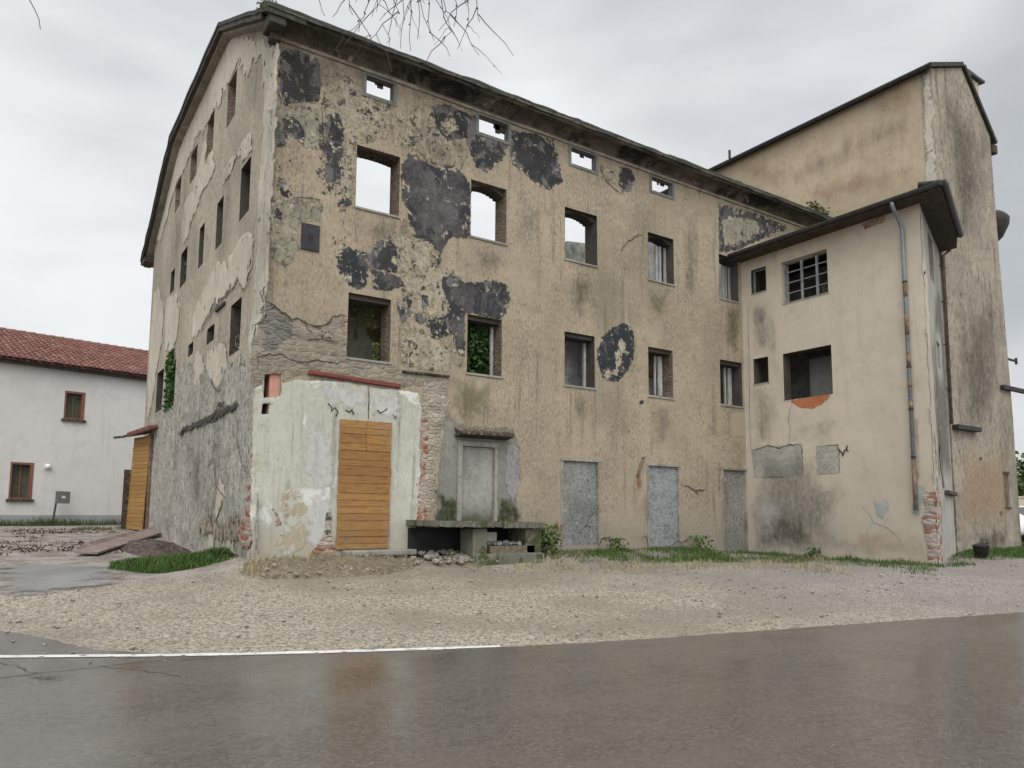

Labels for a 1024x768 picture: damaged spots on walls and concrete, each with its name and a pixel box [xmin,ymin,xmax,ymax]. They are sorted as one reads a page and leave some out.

flaking render [147,34,563,561]
peeling [597,323,635,382]
spalling [719,204,786,253]
crack [747,307,849,479]
flaking render [912,208,945,565]